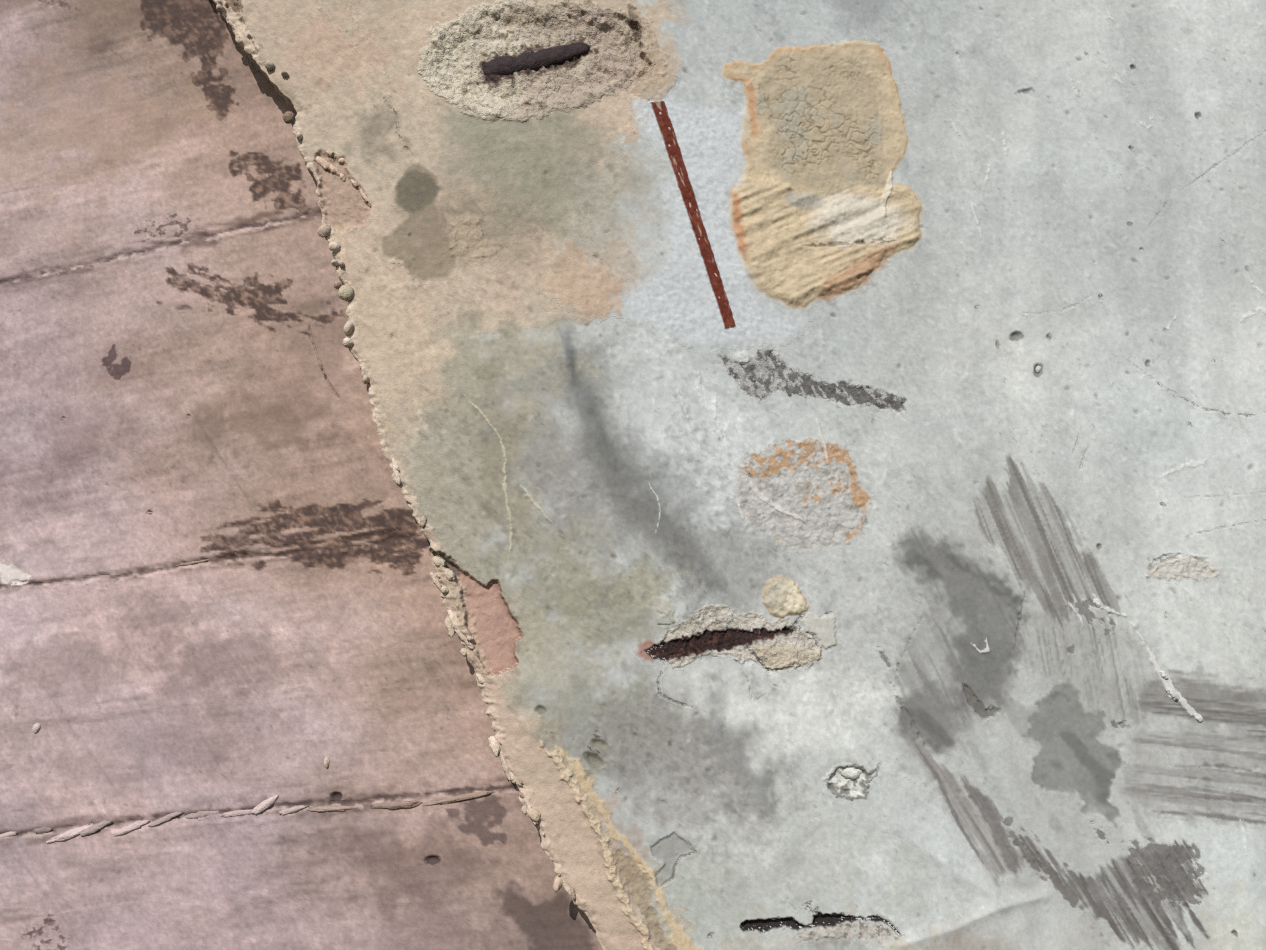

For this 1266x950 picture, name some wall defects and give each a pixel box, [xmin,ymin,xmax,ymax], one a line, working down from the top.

spalling [415,0,738,331]
spalling [718,346,909,415]
peeling [283,104,601,928]
corrosion [728,416,878,555]
spalling [629,571,842,710]
peeling [536,738,706,950]
spalling [821,759,885,803]
damp [918,751,1022,878]
damp [1148,759,1266,829]